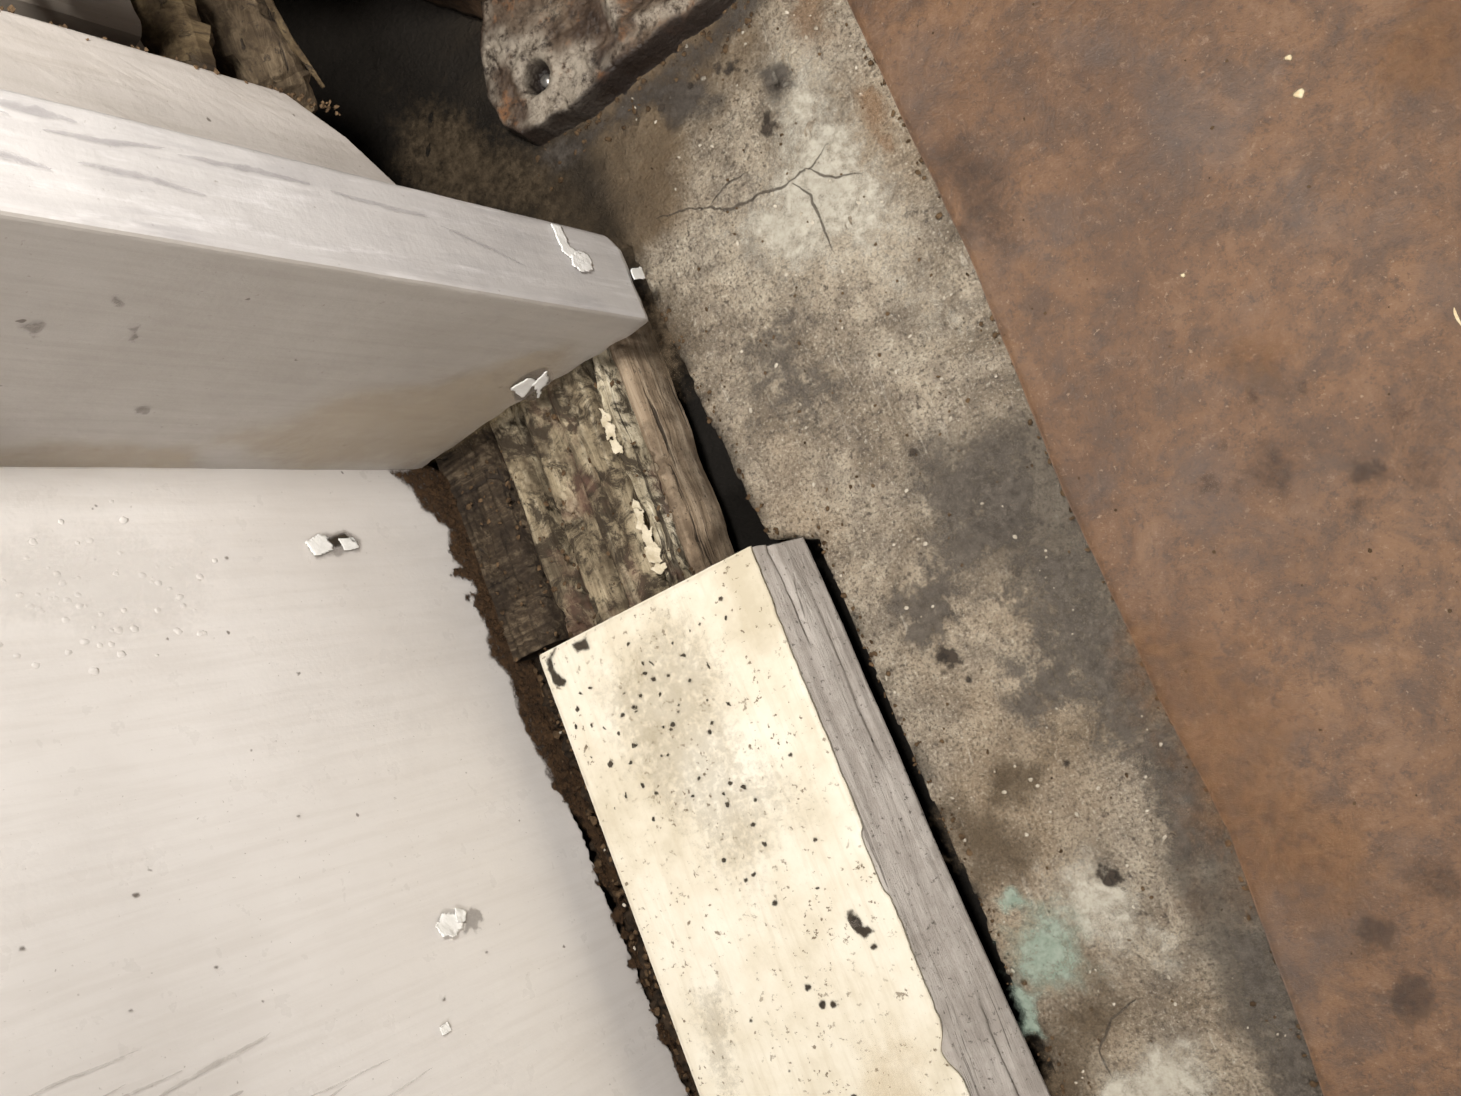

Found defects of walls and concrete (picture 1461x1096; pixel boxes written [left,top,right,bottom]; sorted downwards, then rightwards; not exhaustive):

peeling [551,223,593,272]
peeling [631,267,645,280]
crack [656,146,862,250]
damp [886,436,1232,859]
damp [946,763,1041,881]
damp [1017,873,1129,1031]
damp [1046,985,1205,1096]